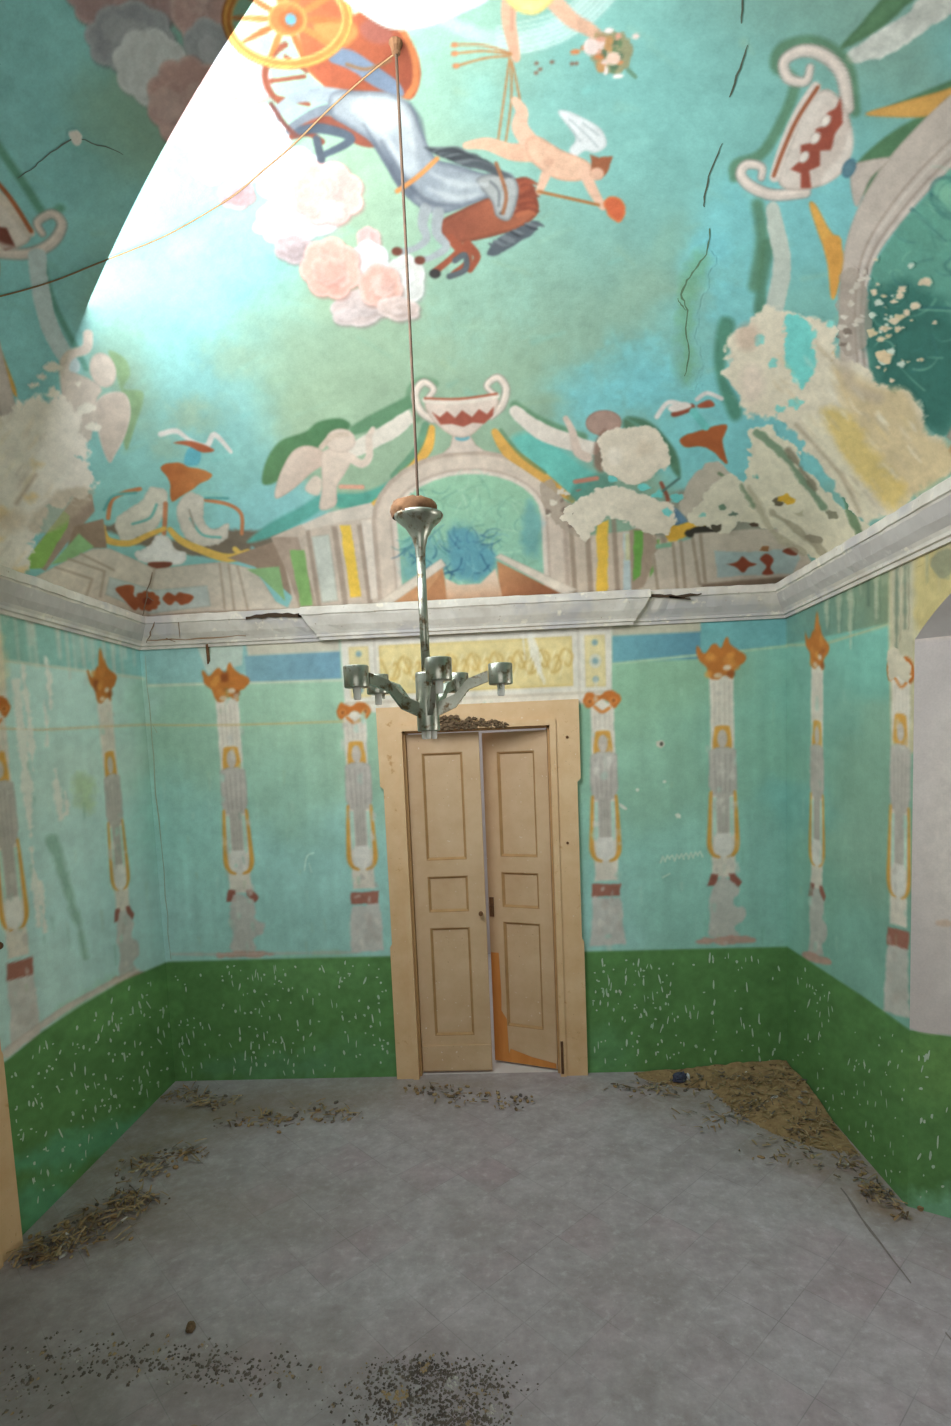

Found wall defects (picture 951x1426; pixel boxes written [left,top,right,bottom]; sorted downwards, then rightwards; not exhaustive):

crack [729,0,748,97]
crack [678,143,723,376]
peeling [0,358,104,575]
peeling [538,254,951,560]